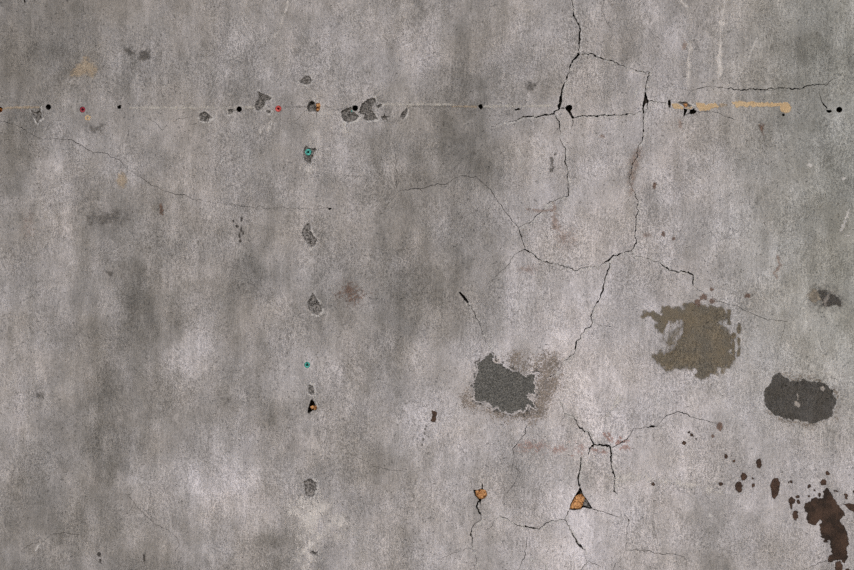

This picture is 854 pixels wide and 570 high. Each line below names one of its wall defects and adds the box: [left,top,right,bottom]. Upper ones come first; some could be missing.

spalling [255,89,274,115]
spalling [339,96,409,124]
crack [386,2,833,377]
spalling [302,223,317,250]
spalling [307,293,324,317]
leakage [641,302,741,379]
peeling [459,349,568,425]
spalling [302,478,319,500]
crack [437,401,723,570]